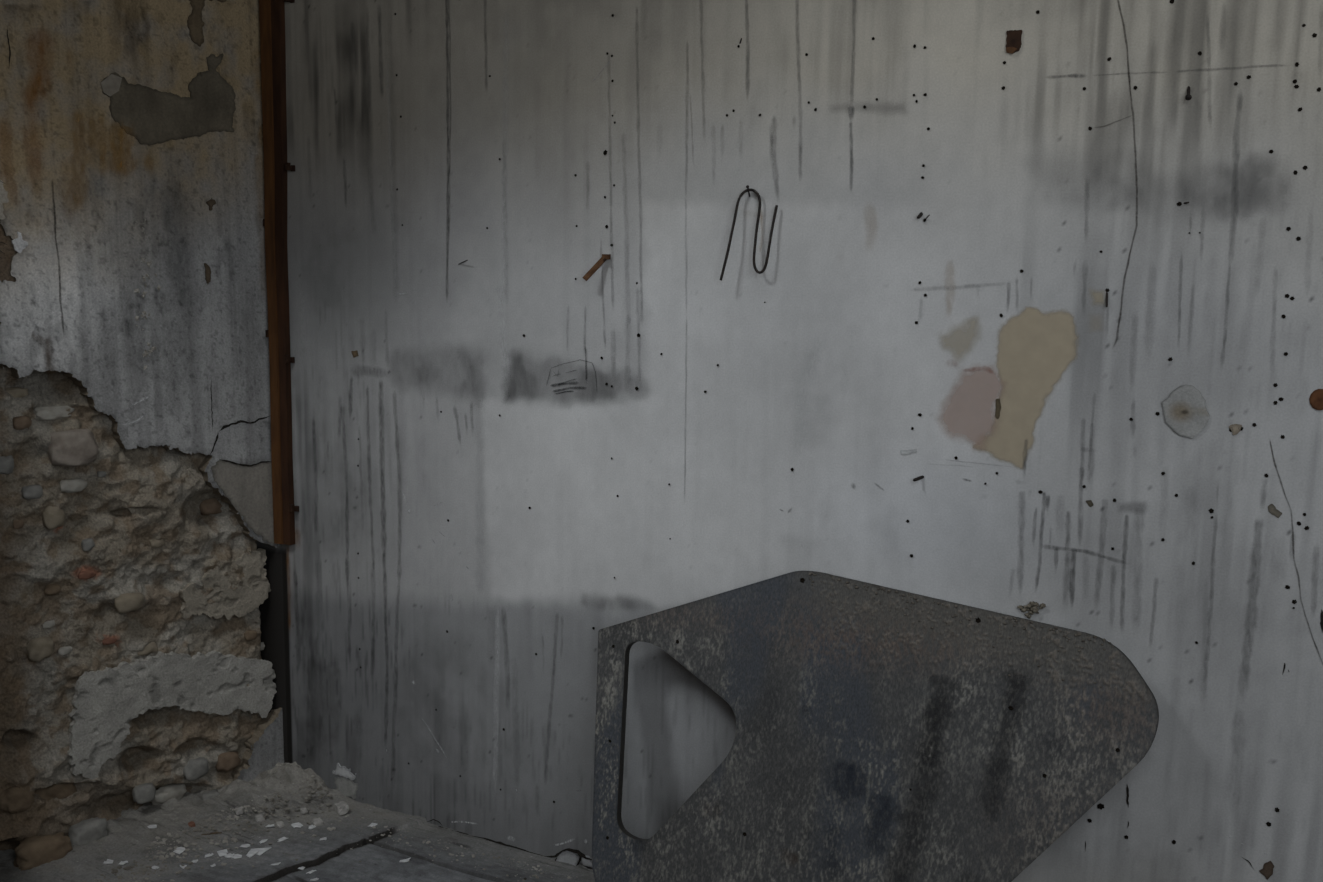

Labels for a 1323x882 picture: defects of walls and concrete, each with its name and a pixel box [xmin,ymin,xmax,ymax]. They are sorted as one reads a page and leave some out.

peeling [101,0,236,146]
spalling [0,180,28,282]
crack [1117,1,1138,333]
peeling [973,307,1077,469]
spalling [0,364,278,871]